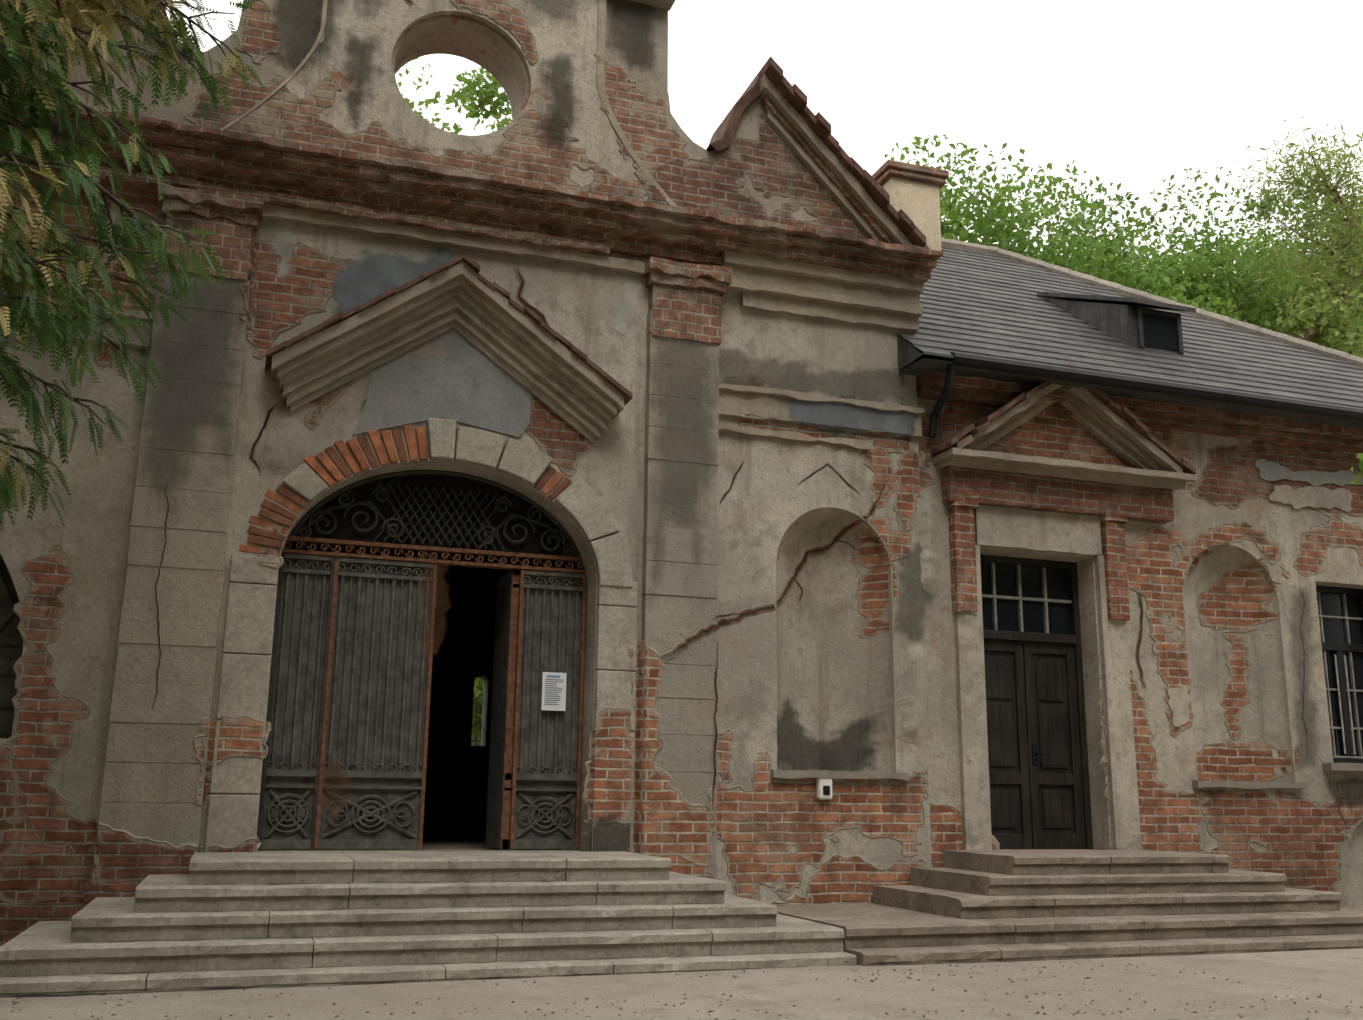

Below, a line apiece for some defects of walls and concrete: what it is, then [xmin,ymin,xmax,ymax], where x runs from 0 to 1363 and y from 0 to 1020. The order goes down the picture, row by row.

spalling [184,0,868,239]
spalling [0,542,271,903]
crack [152,482,170,710]
spalling [525,393,593,477]
spalling [582,640,963,905]
crack [661,460,894,811]
spalling [719,374,991,638]
spalling [1098,661,1112,850]
crack [1135,590,1146,689]
spalling [1125,438,1363,892]